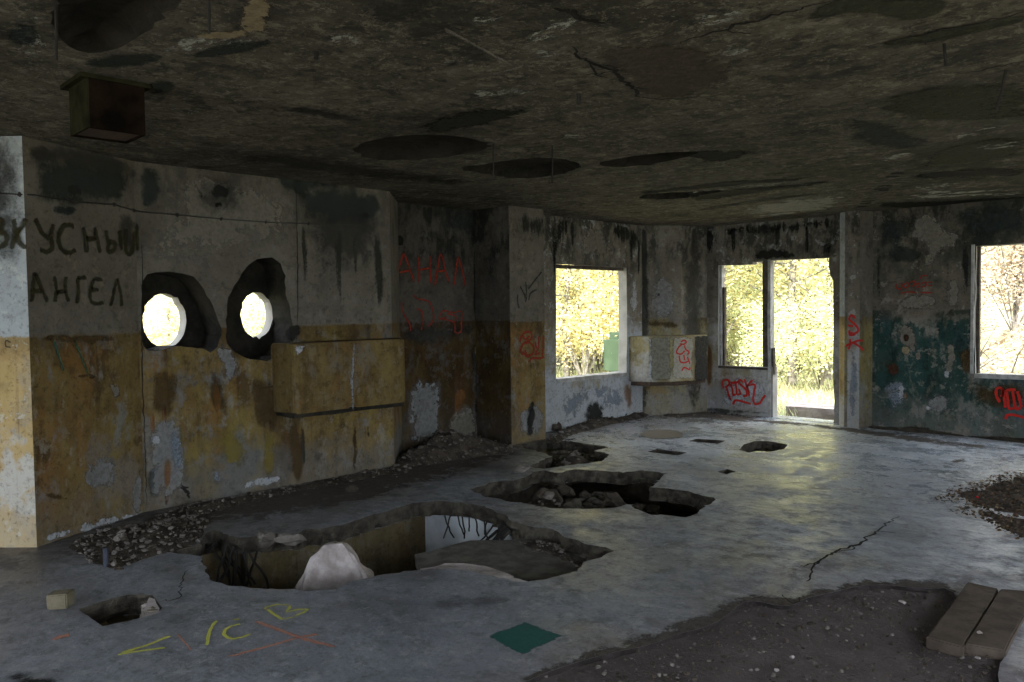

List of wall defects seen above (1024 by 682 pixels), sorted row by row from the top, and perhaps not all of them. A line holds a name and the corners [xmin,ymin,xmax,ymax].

crack [572,46,684,100]
damp [39,157,127,215]
damp [141,169,160,206]
damp [301,189,383,304]
damp [522,214,574,275]
damp [685,218,833,335]
peeling [884,365,907,412]
peeling [899,325,931,360]
peeling [926,396,948,412]
peeling [944,344,970,378]
peeling [47,417,184,541]
crack [782,517,898,604]